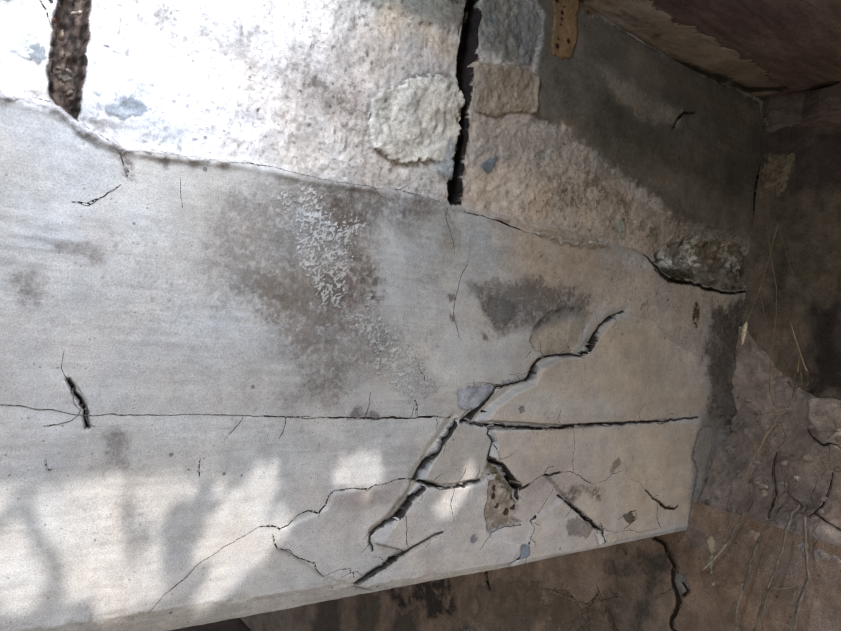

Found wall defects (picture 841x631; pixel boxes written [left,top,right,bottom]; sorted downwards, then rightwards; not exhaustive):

crack [20,0,53,26]
corrosion [551,0,596,60]
crack [29,96,130,206]
water stain [215,177,394,396]
crack [151,149,558,340]
water stain [475,275,590,334]
crack [643,254,747,295]
spalling [654,237,745,291]
crack [1,310,699,631]
spalling [484,479,518,531]